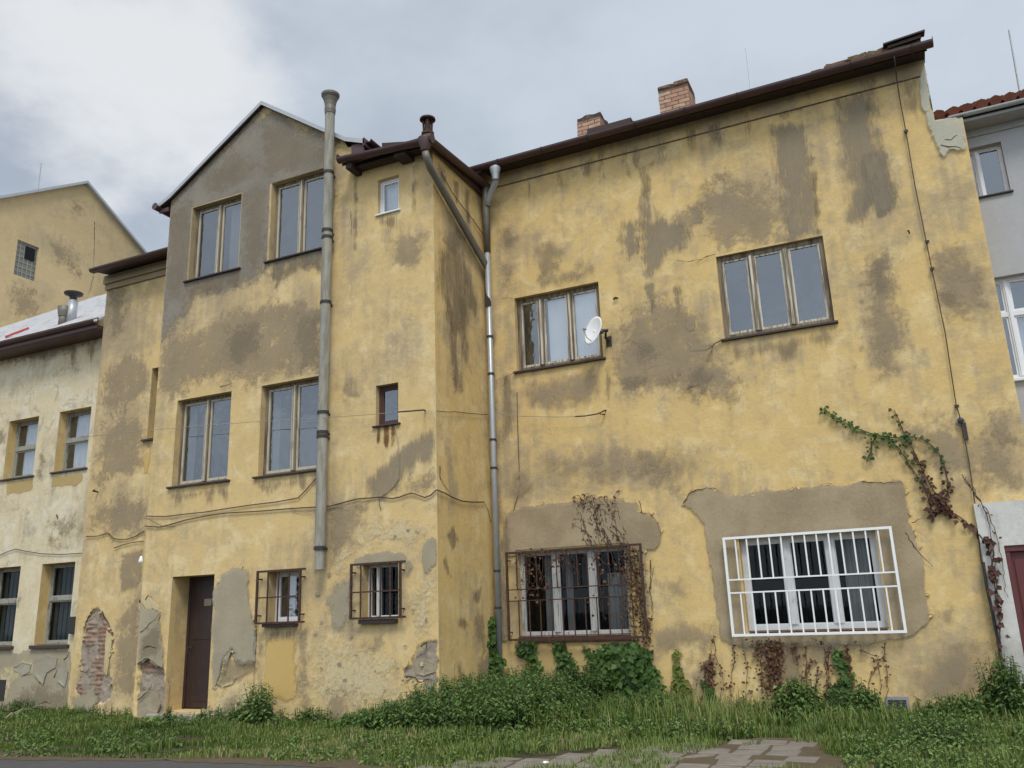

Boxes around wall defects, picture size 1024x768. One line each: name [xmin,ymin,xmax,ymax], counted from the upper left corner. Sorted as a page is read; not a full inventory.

water stain [837,83,896,220]
flaking render [920,70,967,156]
water stain [159,111,339,397]
water stain [441,230,477,389]
water stain [523,112,819,407]
water stain [860,251,908,375]
rust [377,425,395,447]
flaking render [0,608,114,711]
flaking render [136,595,169,718]
flaking render [205,566,257,719]
peeling [301,578,441,718]